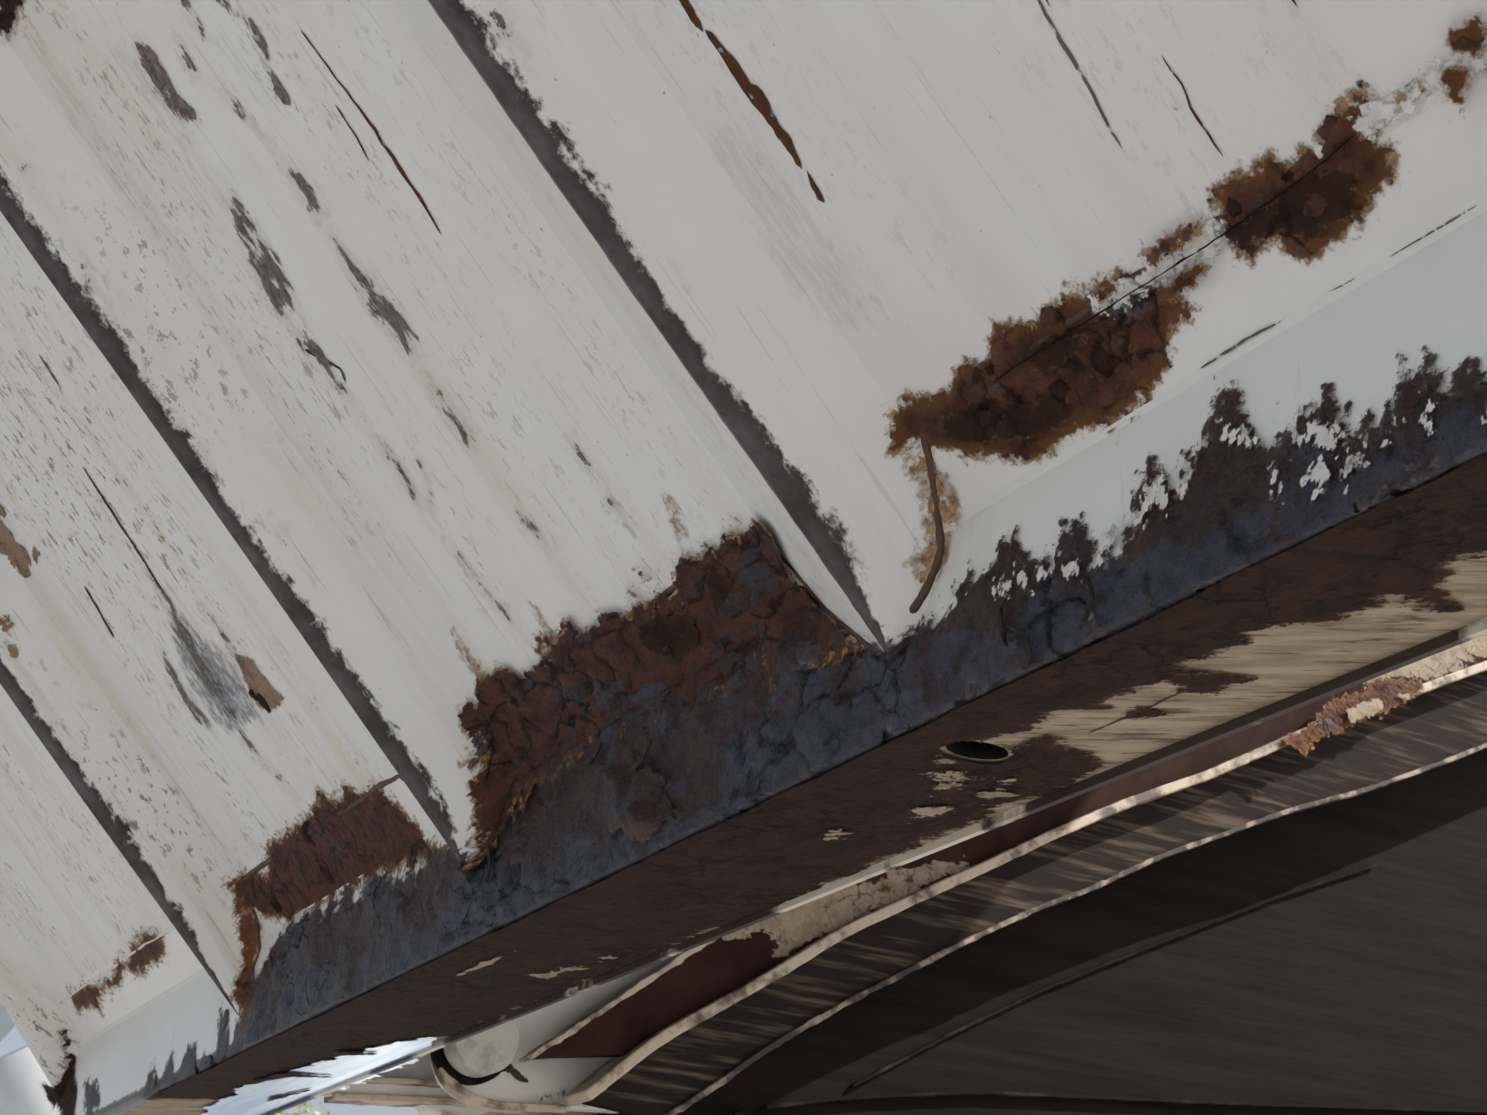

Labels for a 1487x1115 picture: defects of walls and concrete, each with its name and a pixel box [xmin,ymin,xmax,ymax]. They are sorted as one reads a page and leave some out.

crack [679,0,824,202]
corrosion [1206,80,1400,267]
peeling [0,505,40,578]
peeling [0,615,19,659]
corrosion [139,267,1487,1101]
peeling [722,854,971,959]
corrosion [66,927,165,1016]
corrosion [42,1030,100,1115]